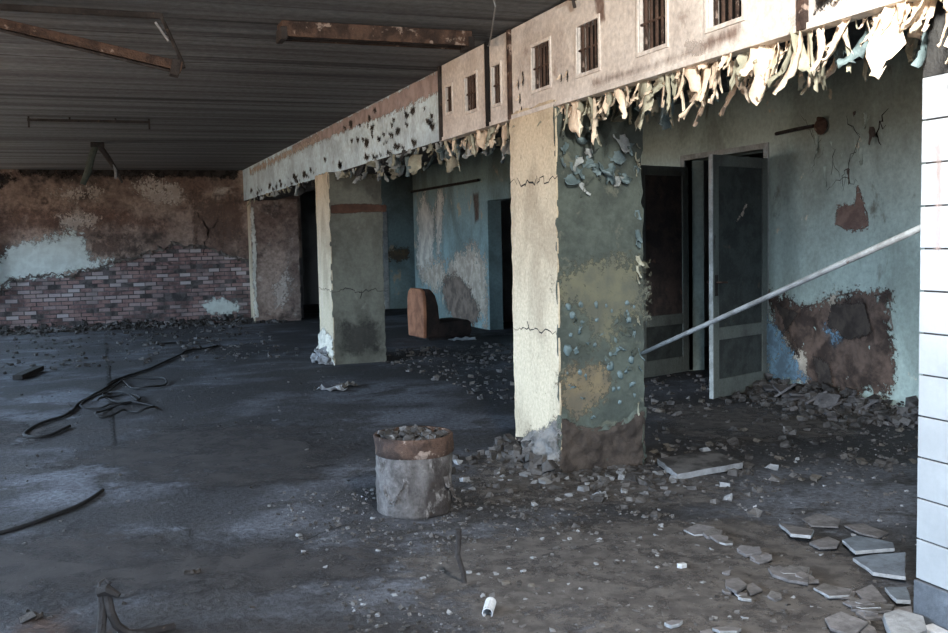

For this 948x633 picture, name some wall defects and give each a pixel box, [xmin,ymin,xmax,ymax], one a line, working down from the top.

crack [510,175,557,187]
peeling [537,0,948,198]
crack [801,109,888,190]
flaking render [835,111,875,233]
spalling [520,210,652,473]
flaking render [767,284,898,400]